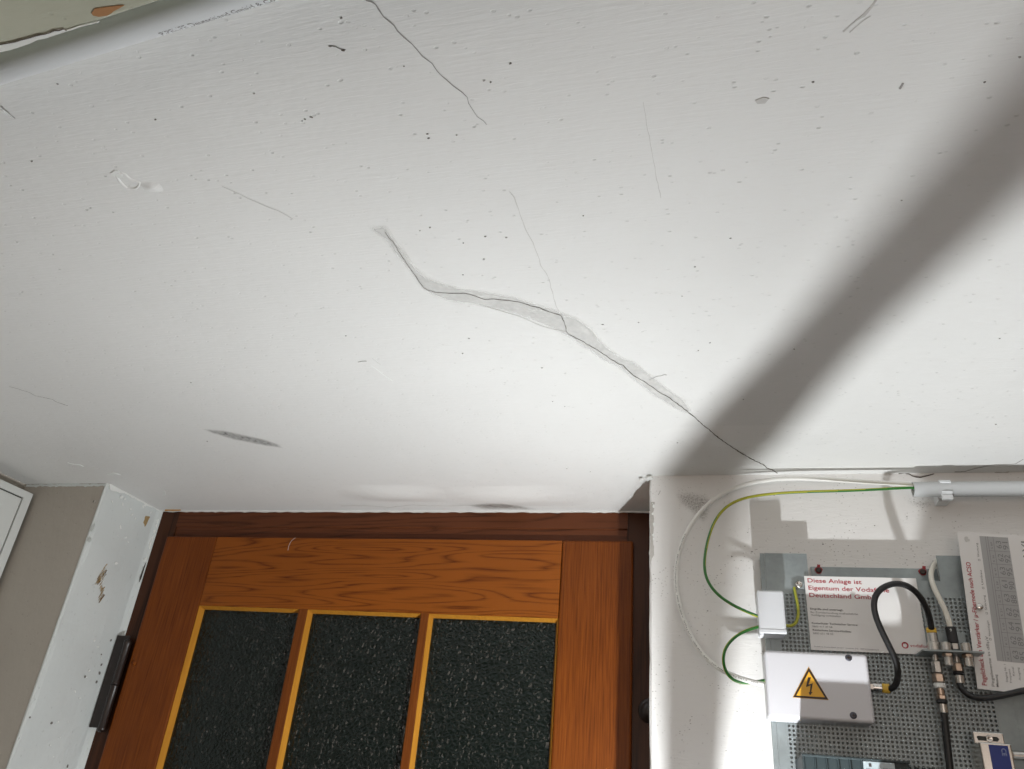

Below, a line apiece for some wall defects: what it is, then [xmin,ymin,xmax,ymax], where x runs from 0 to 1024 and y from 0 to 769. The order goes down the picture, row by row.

peeling [0,5,124,52]
crack [366,0,487,125]
crack [385,191,777,473]
spalling [95,564,107,603]